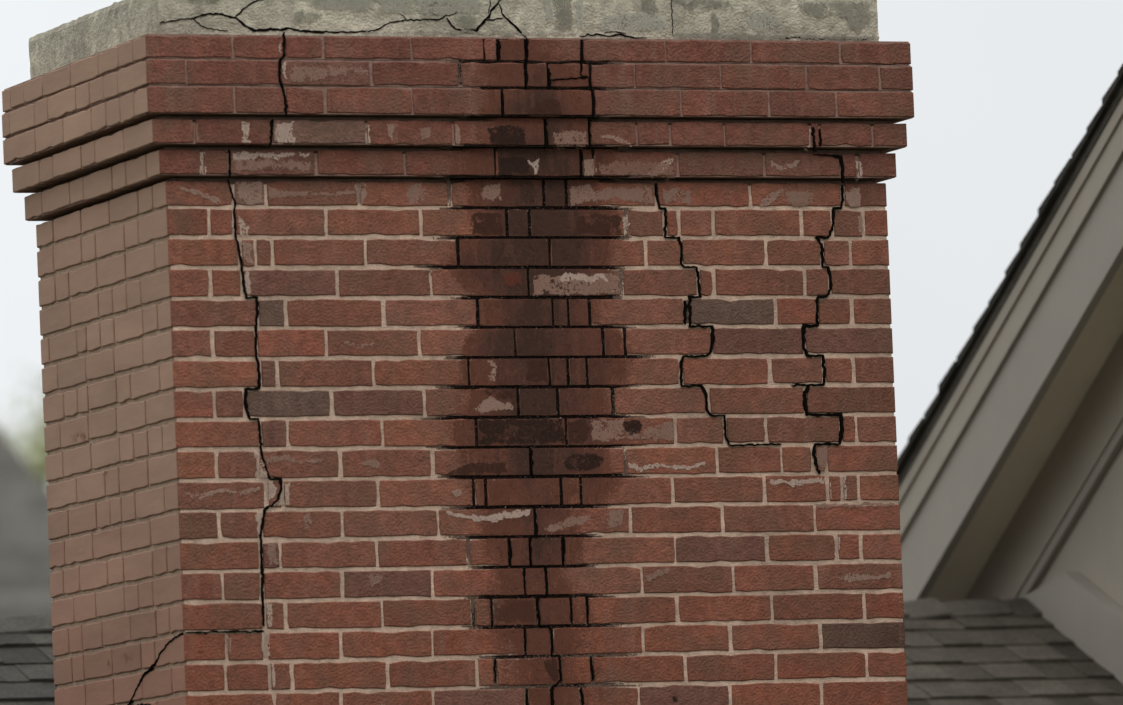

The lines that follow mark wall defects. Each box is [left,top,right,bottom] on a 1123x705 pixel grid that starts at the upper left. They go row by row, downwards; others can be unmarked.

crack [160,0,674,179]
crack [127,149,283,705]
crack [527,449,535,478]
leakage [413,0,706,705]
crack [654,183,782,447]
crack [791,127,845,474]
crack [509,506,594,705]